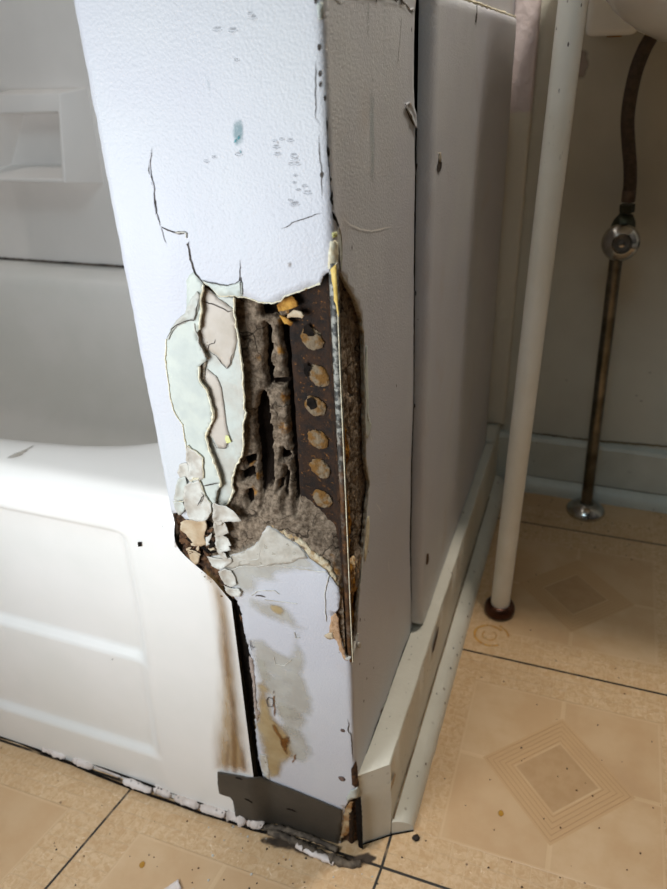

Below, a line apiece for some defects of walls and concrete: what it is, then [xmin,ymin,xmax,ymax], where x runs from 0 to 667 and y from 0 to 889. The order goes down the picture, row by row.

crack [395,0,414,56]
crack [148,148,204,284]
spalling [164,228,372,663]
damp [257,684,296,776]
peeling [255,643,309,759]
spalling [346,762,360,802]